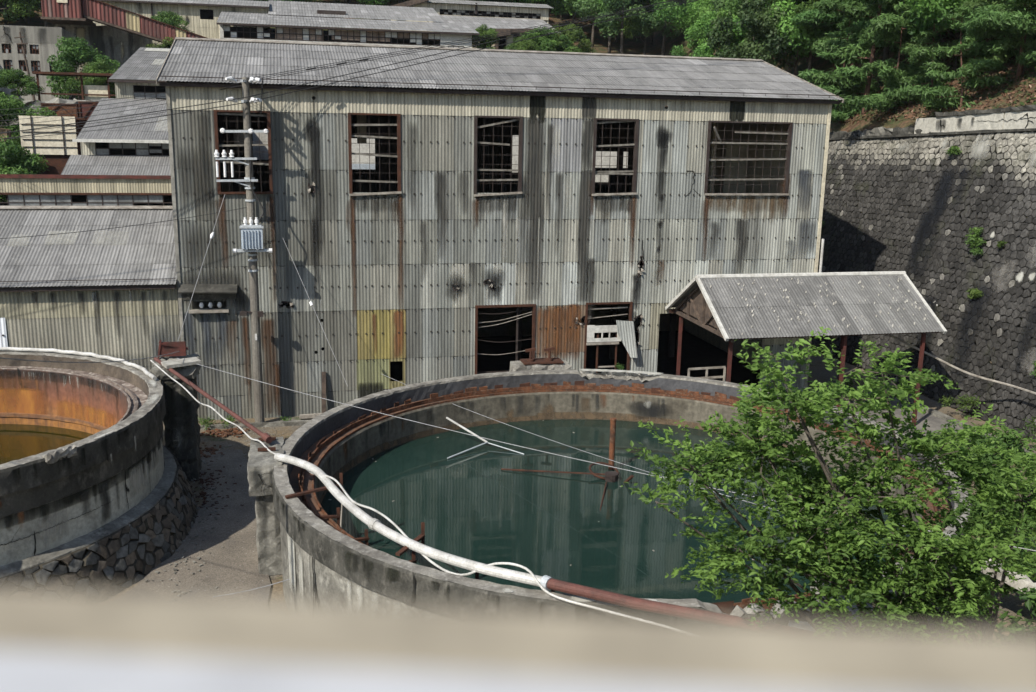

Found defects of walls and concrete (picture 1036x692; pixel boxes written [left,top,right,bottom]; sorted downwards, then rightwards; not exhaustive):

water stain [310,129,321,281]
water stain [479,97,562,285]
water stain [577,120,632,298]
water stain [658,134,667,200]
water stain [800,170,810,200]
water stain [800,222,816,246]
water stain [912,167,968,258]
water stain [973,136,986,155]
corrosion [537,304,580,356]
corrosion [0,389,44,414]